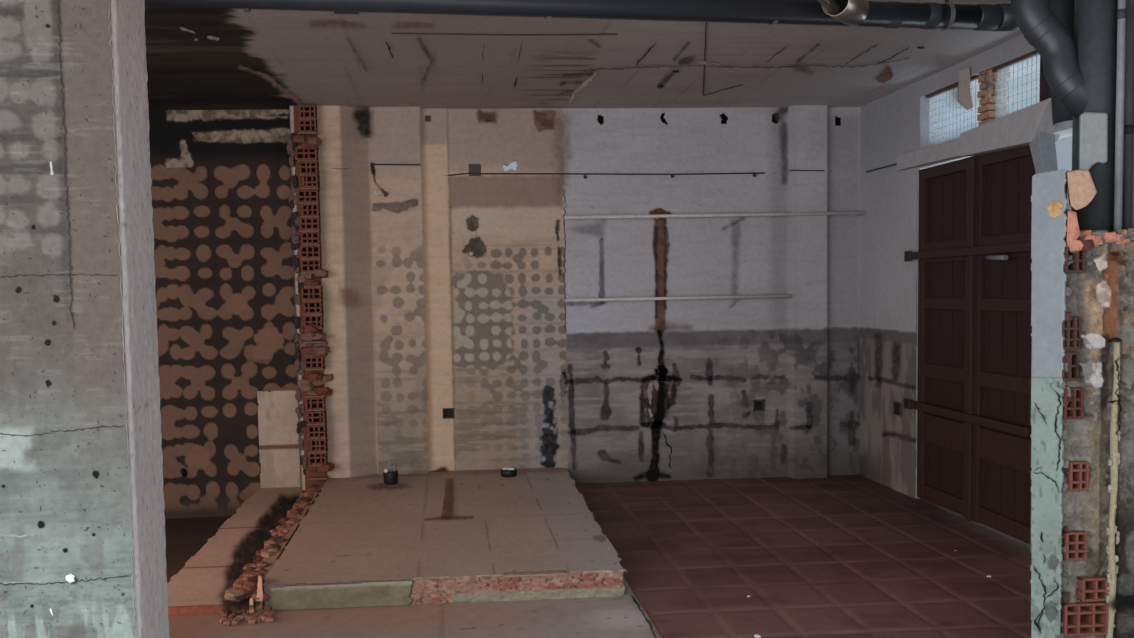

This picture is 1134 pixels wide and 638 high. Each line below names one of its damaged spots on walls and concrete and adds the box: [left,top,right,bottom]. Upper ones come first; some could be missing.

corrosion [650,209,671,333]
spalling [1047,170,1122,307]
water stain [635,330,682,481]
crack [1033,381,1061,493]
spalling [1065,461,1090,492]
flaking render [1062,317,1122,419]
crack [1033,531,1059,633]
spalling [1047,530,1089,569]
spalling [1044,575,1110,637]